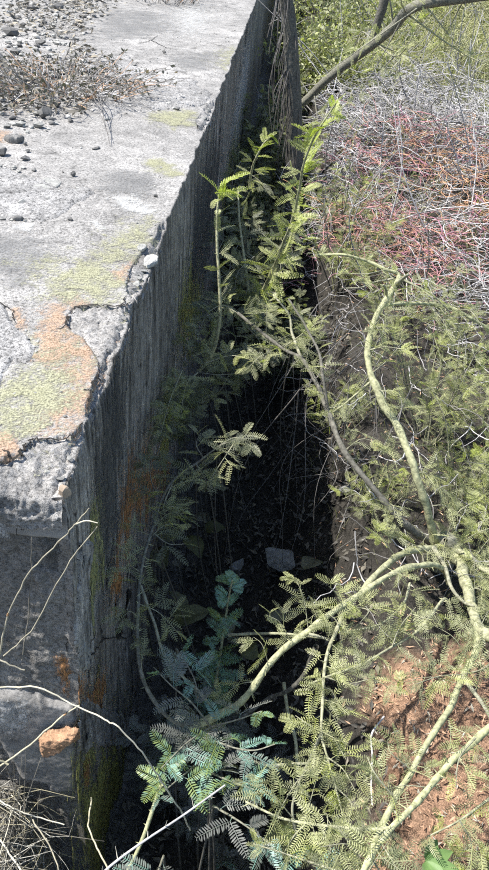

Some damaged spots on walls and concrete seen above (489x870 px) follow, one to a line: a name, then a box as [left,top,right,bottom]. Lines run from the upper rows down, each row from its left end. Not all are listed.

spalling [66,229,162,399]
spalling [0,438,82,531]
corrosion [55,656,106,707]